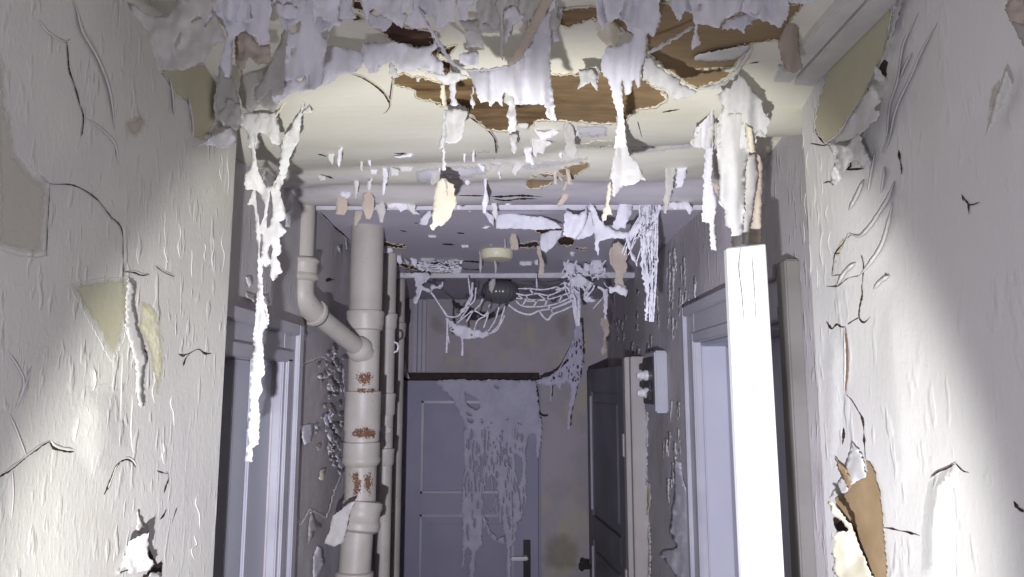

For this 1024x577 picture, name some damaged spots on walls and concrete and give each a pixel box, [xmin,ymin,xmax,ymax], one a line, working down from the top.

crack [66,42,86,134]
peeling [811,0,903,186]
crack [44,179,175,277]
peeling [127,0,817,462]
peeling [69,276,162,408]
corrosion [355,371,375,393]
crack [826,234,886,454]
crack [0,440,75,477]
peeling [295,343,348,577]
corrosion [348,472,373,497]
corrosion [351,428,376,439]
peeling [117,512,163,577]